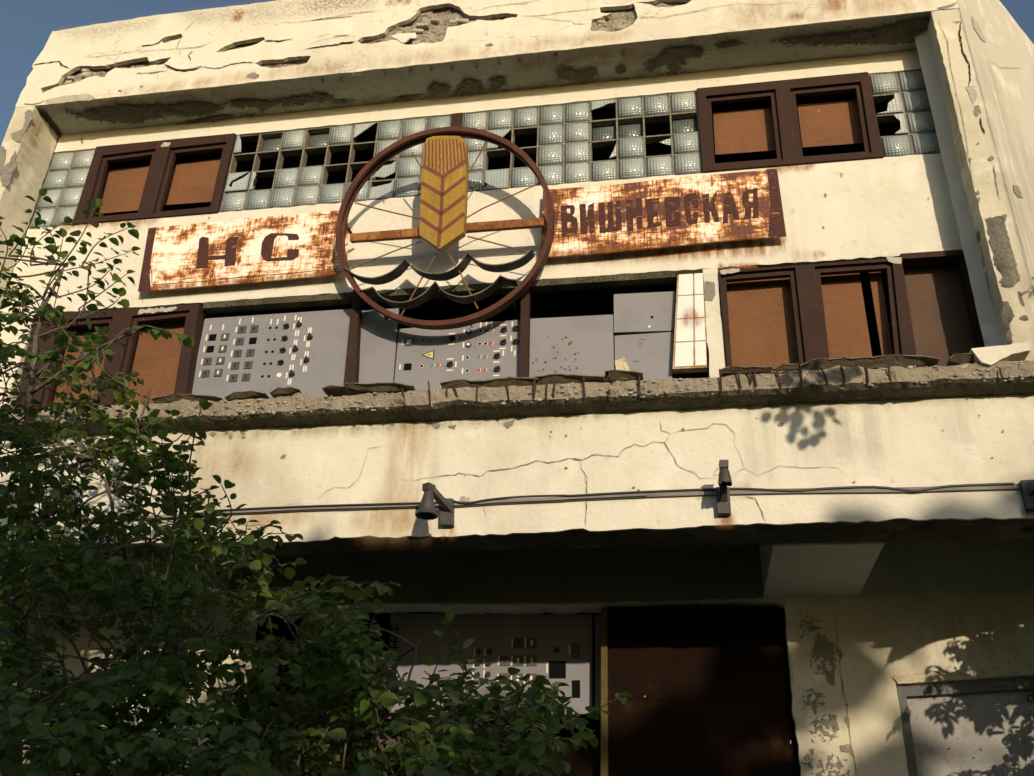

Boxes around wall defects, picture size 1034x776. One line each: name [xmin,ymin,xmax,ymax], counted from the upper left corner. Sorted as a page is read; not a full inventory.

spalling [161,34,182,43]
spalling [217,37,265,52]
spalling [357,3,518,45]
crack [454,0,597,24]
spalling [590,0,691,32]
peeling [41,56,355,126]
crack [939,19,1015,199]
peeling [0,110,33,186]
peeling [976,214,1029,343]
spalling [719,367,802,391]
crack [403,422,841,526]
peeling [794,612,854,776]